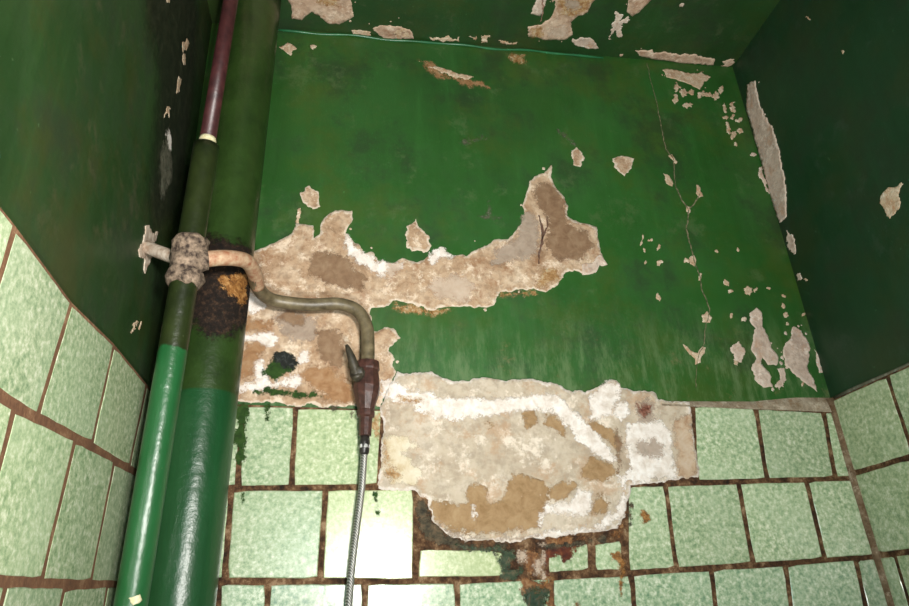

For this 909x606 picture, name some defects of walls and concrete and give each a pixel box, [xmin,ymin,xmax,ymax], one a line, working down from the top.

peeling [279,42,297,55]
peeling [288,0,414,39]
peeling [430,35,517,45]
peeling [528,0,598,49]
peeling [608,0,651,40]
peeling [431,66,473,80]
peeling [635,48,796,254]
peeling [879,182,903,218]
flaking render [238,165,700,543]
peeling [730,308,823,392]
water stain [413,497,627,606]
corrosion [543,535,585,577]